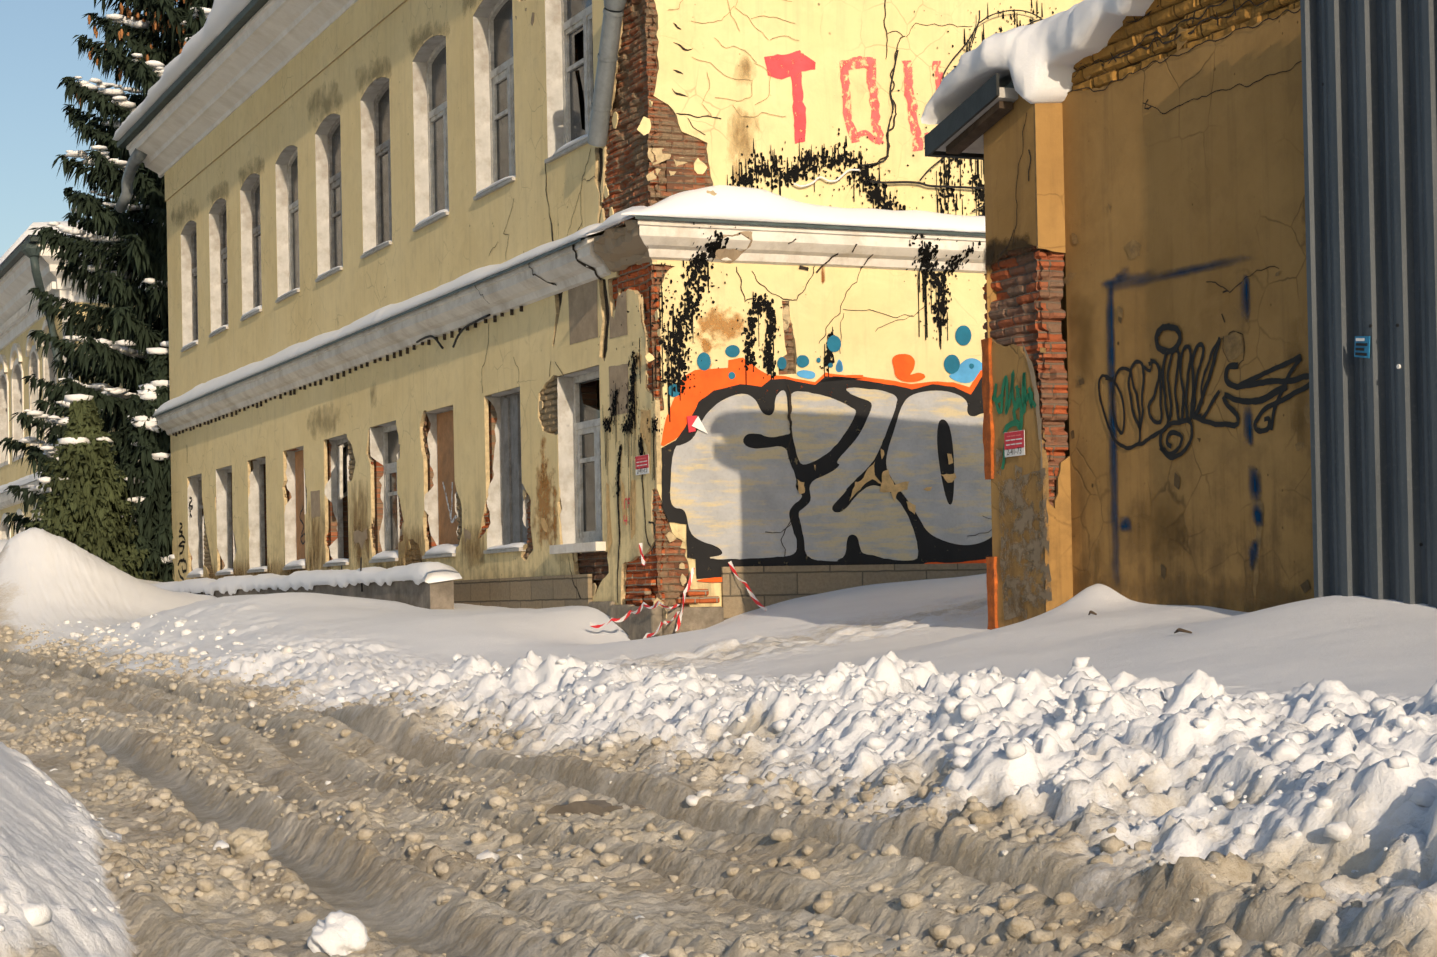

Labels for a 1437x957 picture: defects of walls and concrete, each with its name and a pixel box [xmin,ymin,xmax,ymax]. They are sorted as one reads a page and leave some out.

flaking render [601,0,713,228]
crack [668,0,800,135]
crack [862,0,972,169]
crack [1068,0,1302,114]
flaking render [1071,0,1300,92]
crack [736,238,925,354]
water stain [537,440,557,542]
flaking render [539,374,566,435]
spalling [574,480,720,619]
flaking render [982,245,1084,620]